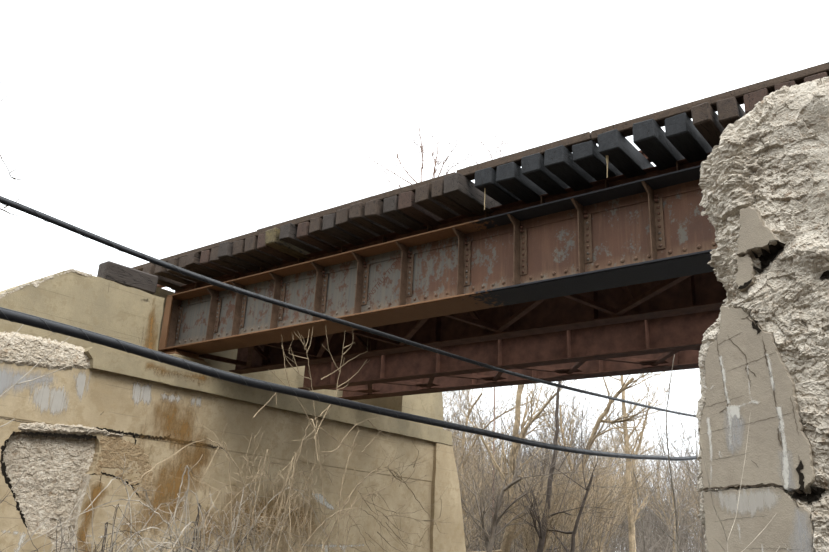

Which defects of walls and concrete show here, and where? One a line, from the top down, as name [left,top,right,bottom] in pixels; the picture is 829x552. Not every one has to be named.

spalling [0,331,90,371]
spalling [2,422,154,552]
spalling [696,316,765,552]
crack [700,314,826,508]
spalling [712,76,829,552]